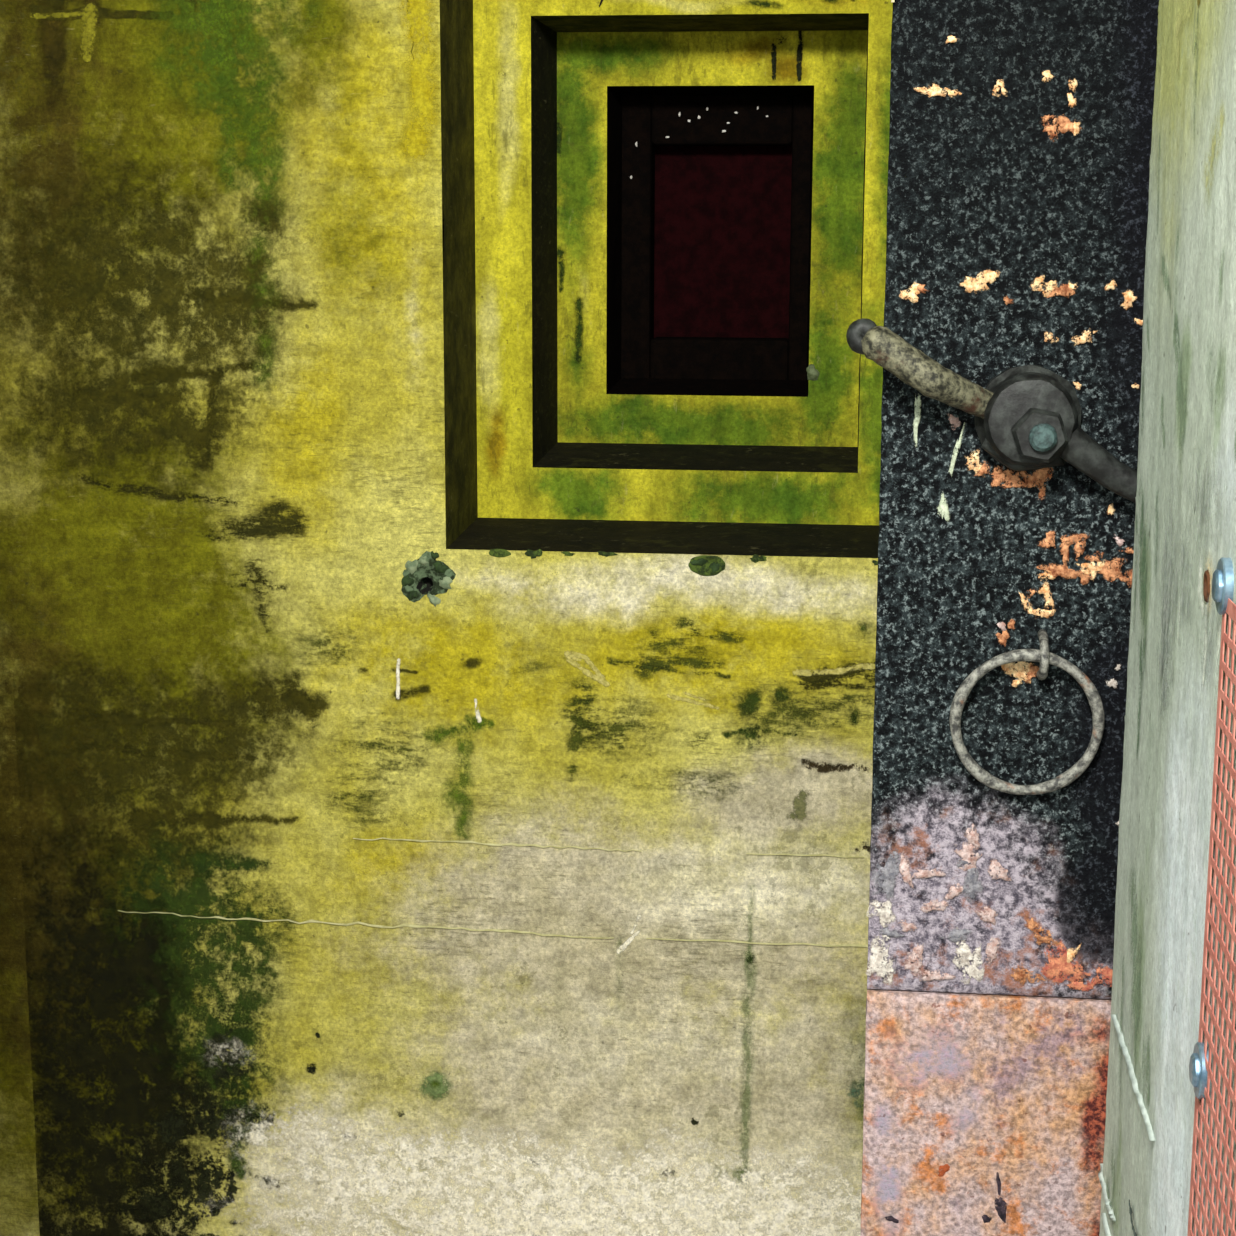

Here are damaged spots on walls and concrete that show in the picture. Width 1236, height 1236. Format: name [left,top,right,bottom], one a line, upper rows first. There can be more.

leakage [29,0,196,107]
peeling [915,83,962,97]
peeling [1042,79,1081,141]
peeling [899,282,926,303]
peeling [960,270,999,293]
peeling [1105,280,1143,325]
leakage [0,160,316,541]
leakage [231,559,286,633]
leakage [465,658,481,668]
leakage [607,618,743,679]
peeling [866,824,1012,985]
leakage [16,660,875,1236]